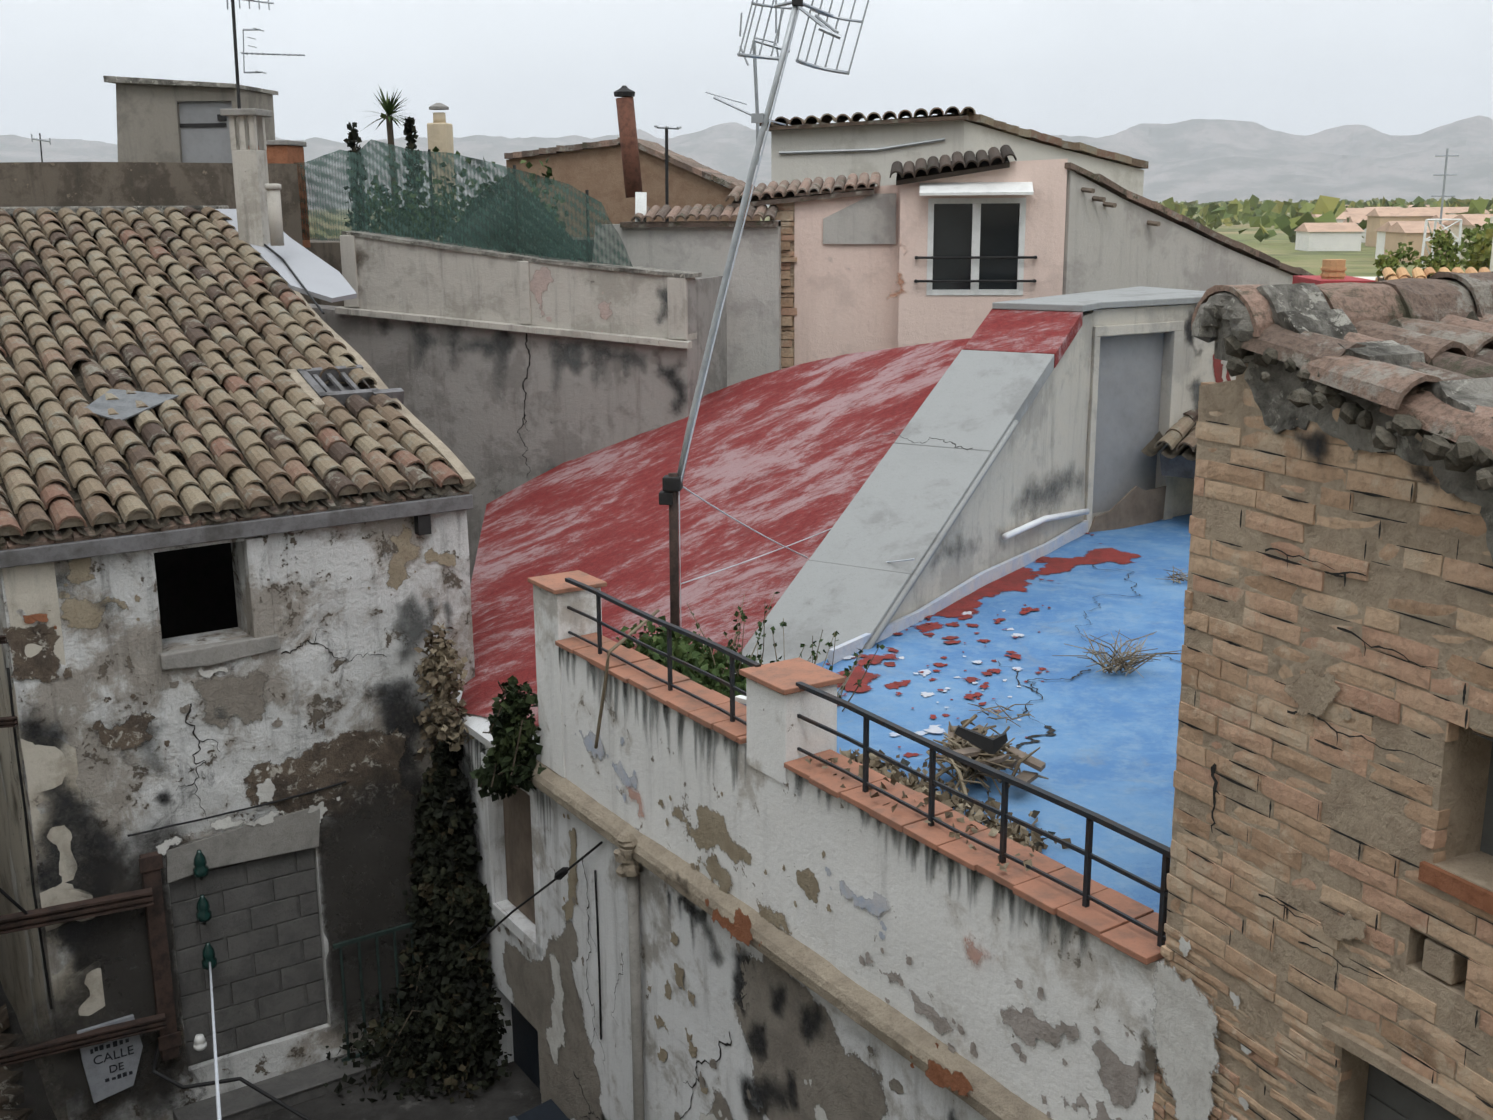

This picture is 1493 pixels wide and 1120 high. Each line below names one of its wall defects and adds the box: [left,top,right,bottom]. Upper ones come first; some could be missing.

crack [517,333,531,475]
damp [18,718,63,750]
crack [178,703,220,820]
peeling [210,721,427,830]
damp [319,681,423,1029]
damp [559,647,747,763]
peeling [826,533,1142,758]
crack [1211,763,1220,833]
damp [8,780,202,1120]
peeling [647,791,978,1120]
crack [680,1032,732,1119]
peeling [1000,936,1249,1120]